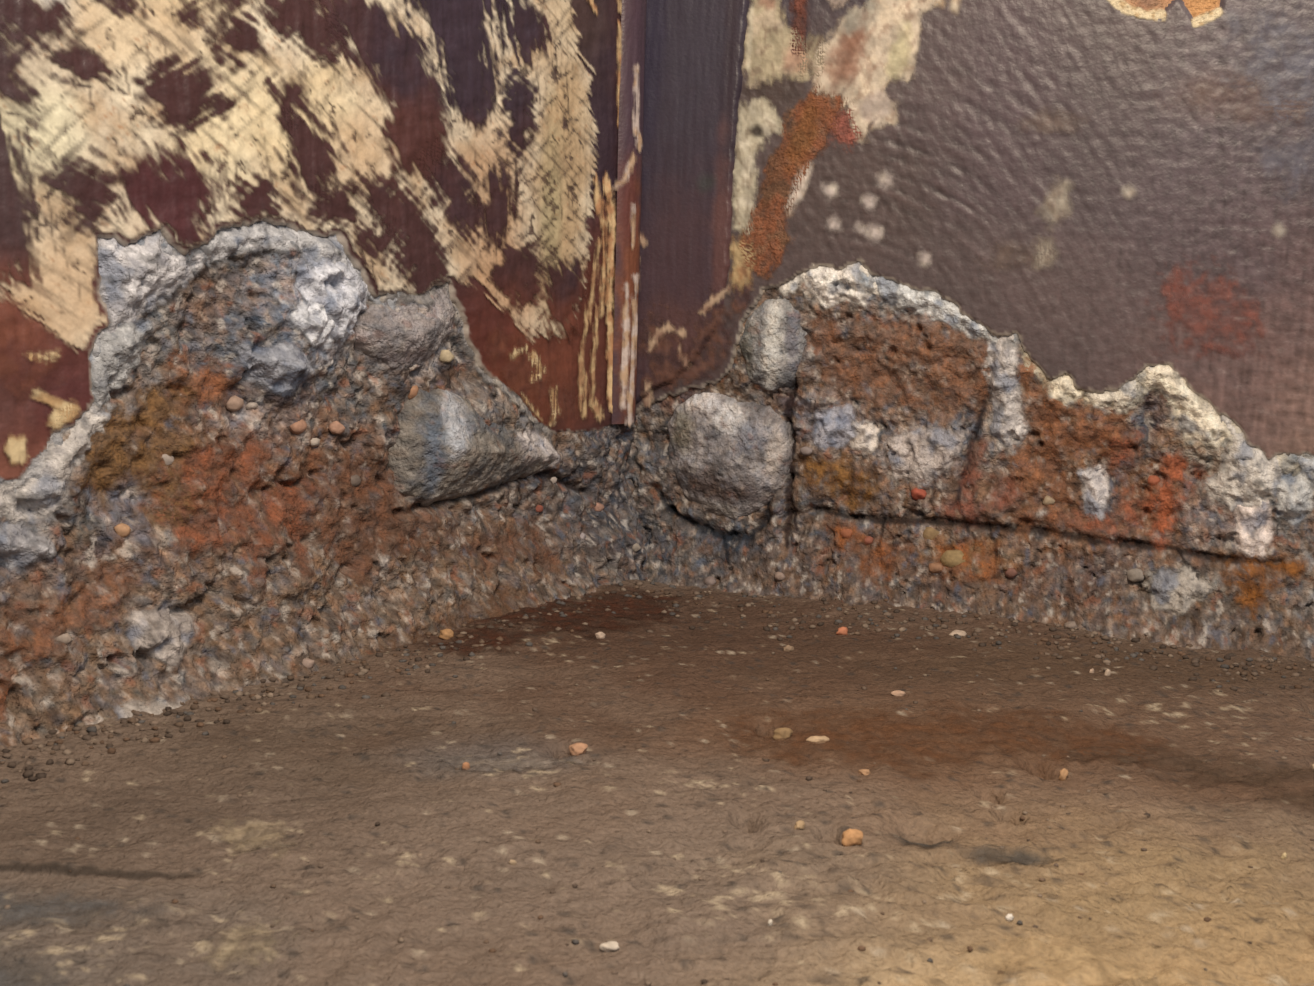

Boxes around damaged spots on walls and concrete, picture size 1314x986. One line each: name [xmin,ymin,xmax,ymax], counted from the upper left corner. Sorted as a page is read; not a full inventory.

corrosion [791,0,807,54]
corrosion [640,85,861,394]
corrosion [74,353,437,577]
spalling [0,0,1314,748]
crack [656,372,1273,579]
corrosion [1014,363,1199,548]